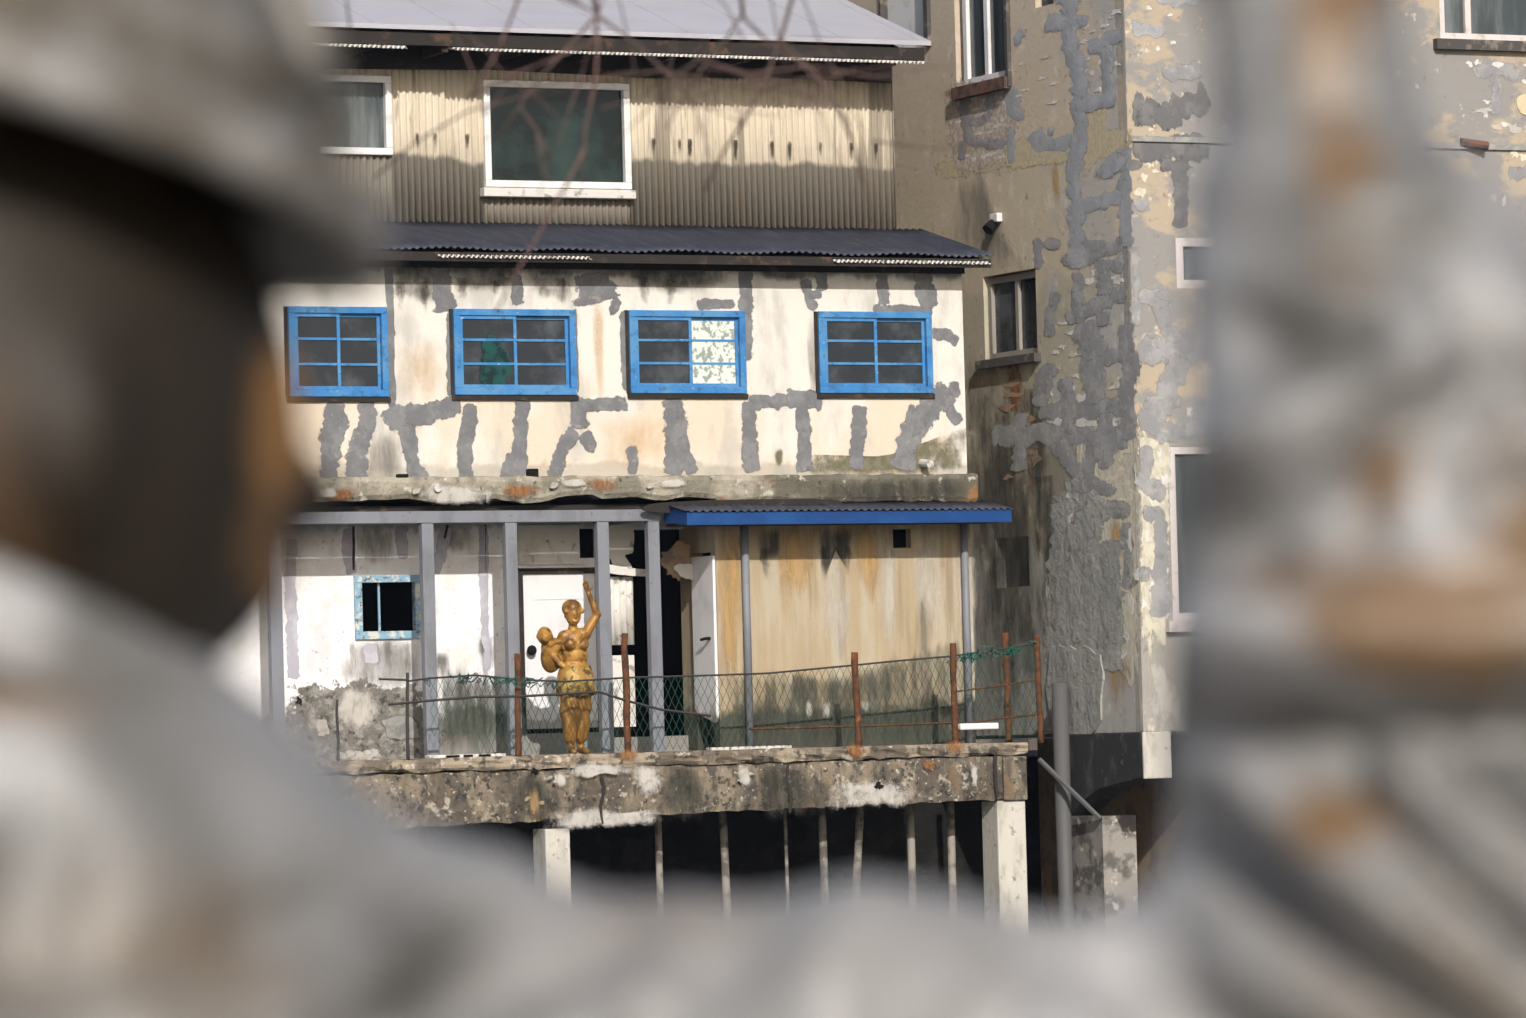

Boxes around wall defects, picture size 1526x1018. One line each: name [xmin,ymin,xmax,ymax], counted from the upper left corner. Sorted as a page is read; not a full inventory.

peeling [945,9,1156,179]
peeling [1472,64,1526,161]
peeling [1133,162,1159,198]
peeling [1084,270,1124,285]
spalling [549,479,584,489]
peeling [998,322,1171,691]
leakage [761,532,779,563]
leakage [821,530,850,569]
leakage [885,548,894,634]
spalling [286,678,453,760]
leakage [764,660,948,726]
leakage [517,773,554,816]